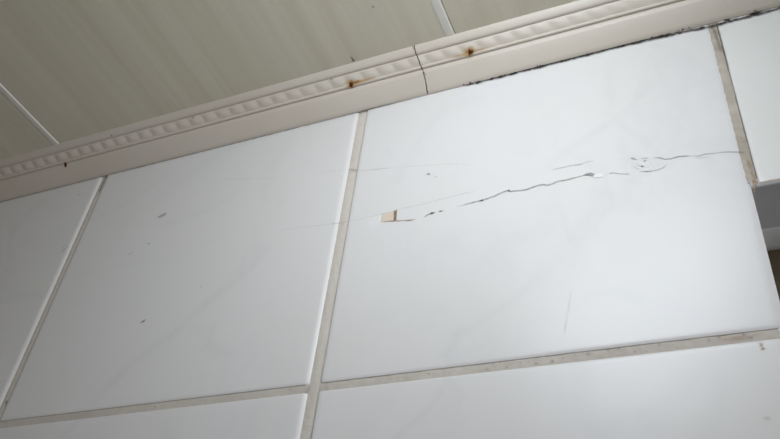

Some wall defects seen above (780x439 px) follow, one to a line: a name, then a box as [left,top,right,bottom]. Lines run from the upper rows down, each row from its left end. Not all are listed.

water stain [463,7,780,86]
spalling [368,210,411,229]